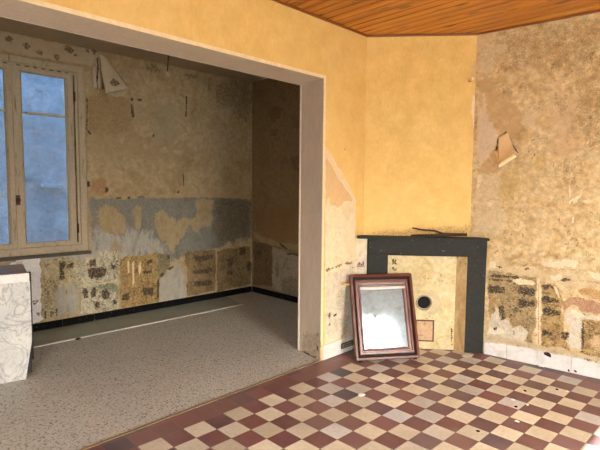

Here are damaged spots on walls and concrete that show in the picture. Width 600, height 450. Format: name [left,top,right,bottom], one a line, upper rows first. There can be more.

peeling [91,52,142,131]
peeling [476,94,518,168]
spalling [159,259,188,302]
spalling [271,247,298,297]
spalling [488,261,600,292]
spalling [483,307,600,365]